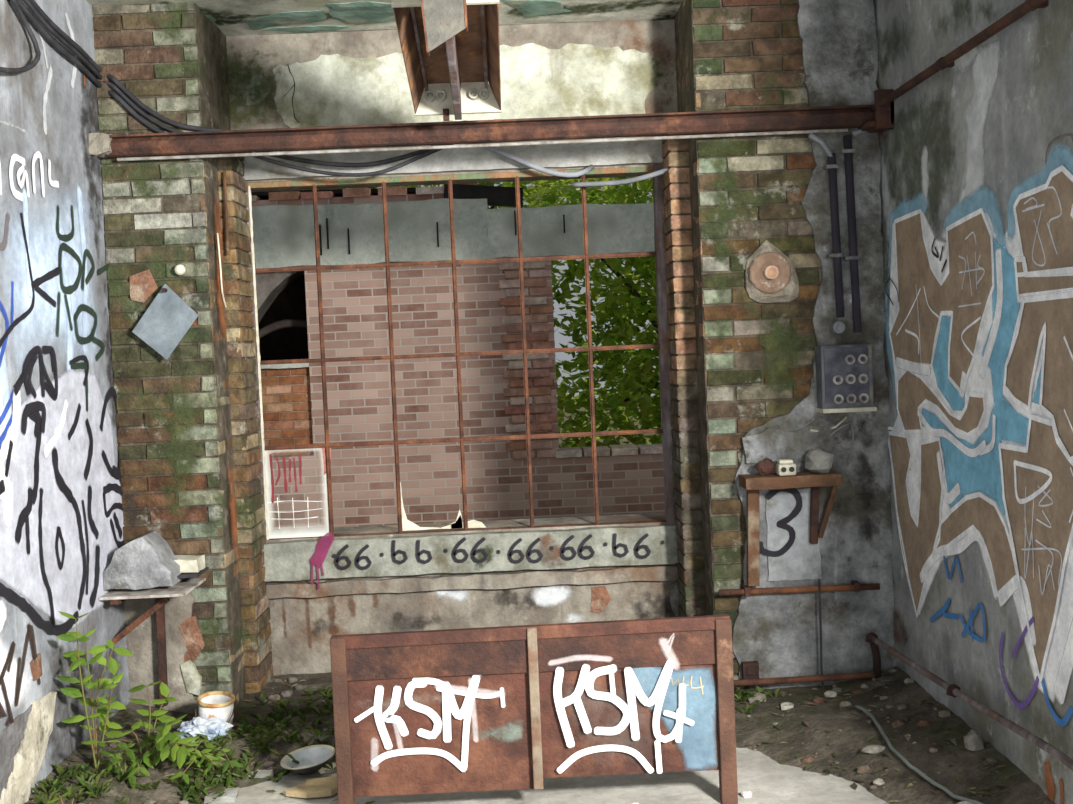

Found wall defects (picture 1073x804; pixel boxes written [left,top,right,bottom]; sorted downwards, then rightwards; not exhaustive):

flaking render [246,43,659,128]
water stain [65,12,101,252]
water stain [107,326,118,428]
flaking render [742,417,842,463]
rust [329,595,338,634]
rust [1044,761,1064,804]